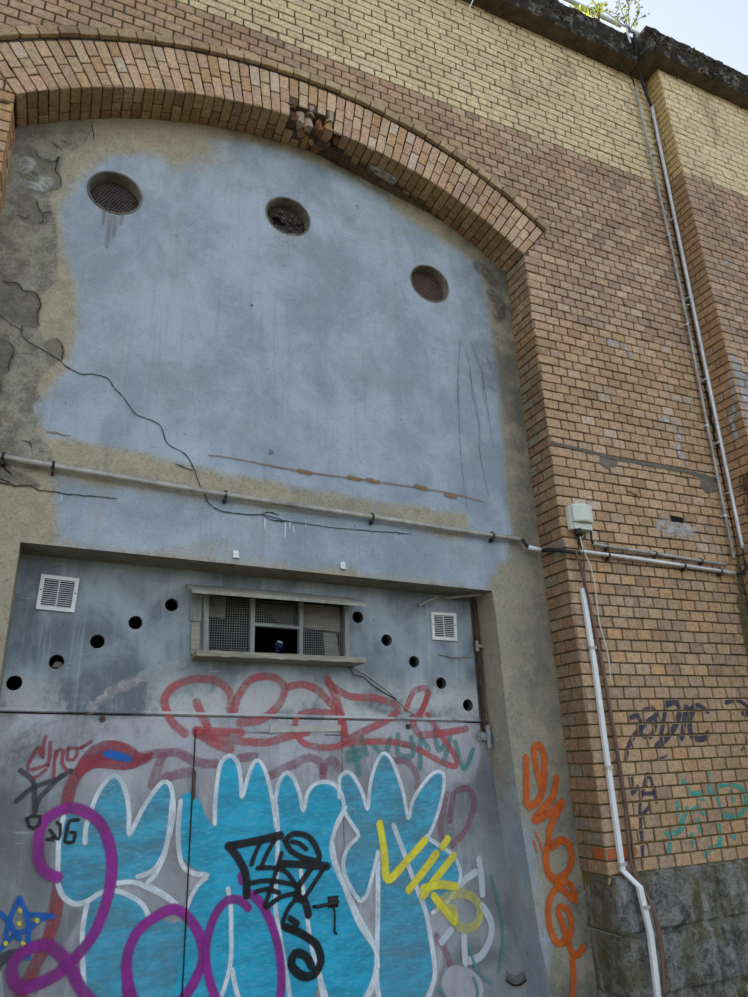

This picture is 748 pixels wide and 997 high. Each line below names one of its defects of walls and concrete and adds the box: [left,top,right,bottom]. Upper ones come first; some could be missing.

spalling [287,99,341,157]
crack [0,315,405,534]
leakage [727,355,748,445]
corrosion [208,455,484,502]
leakage [733,527,748,656]